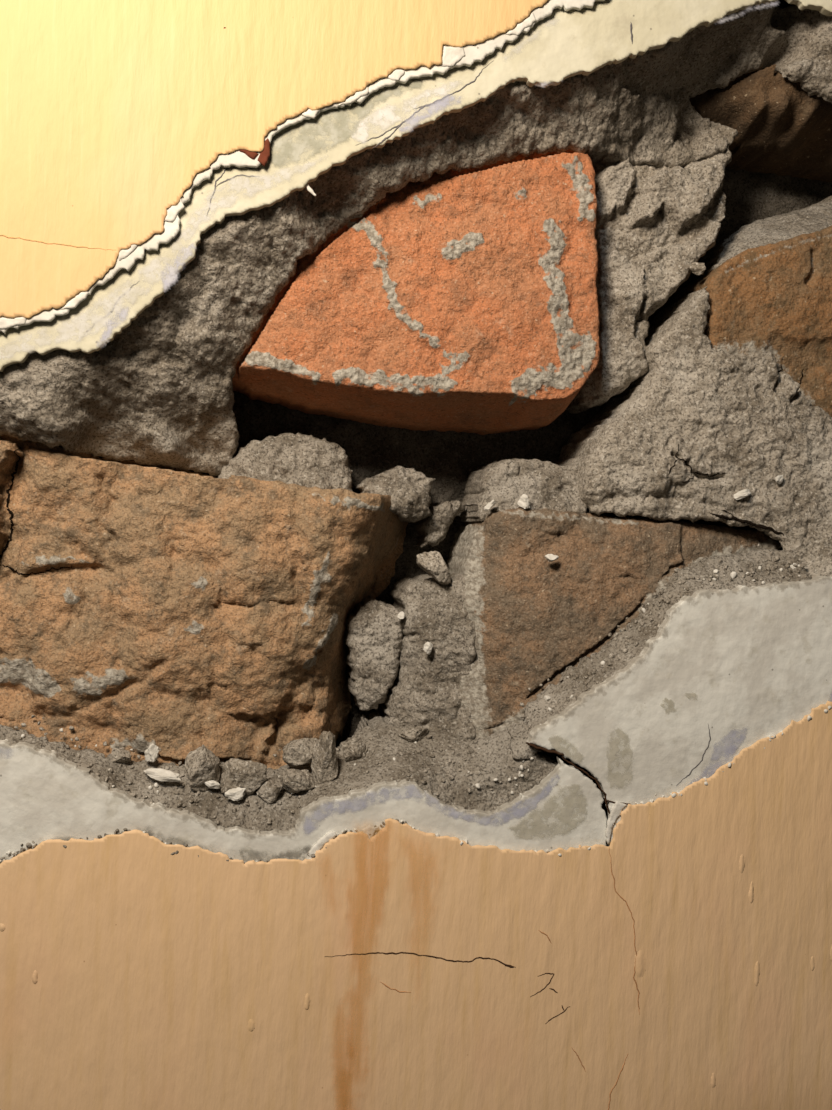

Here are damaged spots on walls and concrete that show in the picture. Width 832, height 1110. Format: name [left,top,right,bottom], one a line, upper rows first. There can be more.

flaking render [0,0,832,372]
crack [0,448,72,575]
flaking render [517,494,530,509]
flaking render [734,489,751,500]
flaking render [0,576,832,863]
crack [526,742,630,814]
crack [609,848,640,1015]
crack [325,952,570,1024]
crack [608,1054,628,1110]